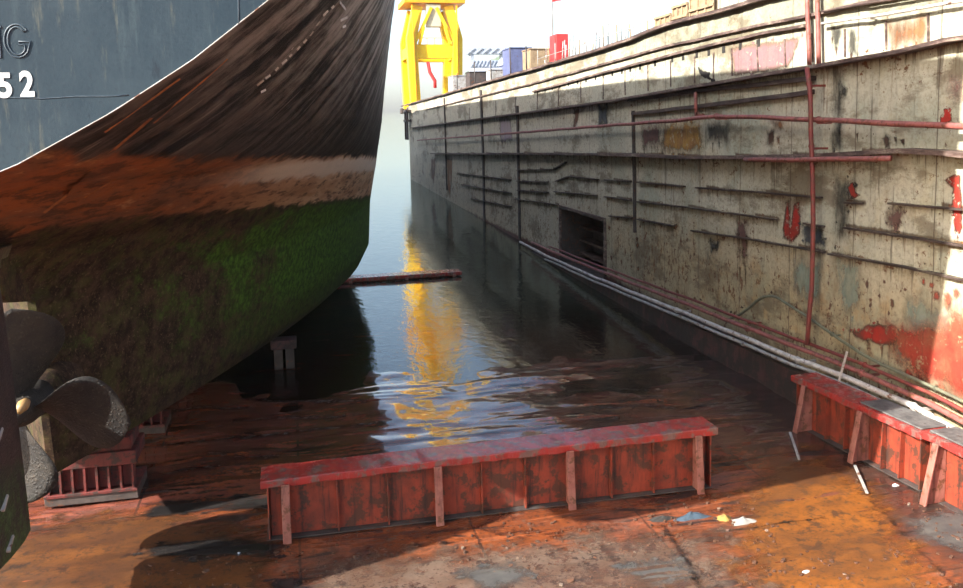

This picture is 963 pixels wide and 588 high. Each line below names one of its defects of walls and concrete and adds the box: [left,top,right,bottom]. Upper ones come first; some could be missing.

peeling [783,201,801,242]
peeling [834,175,963,395]
corrosion [0,510,274,588]
corrosion [711,444,936,588]